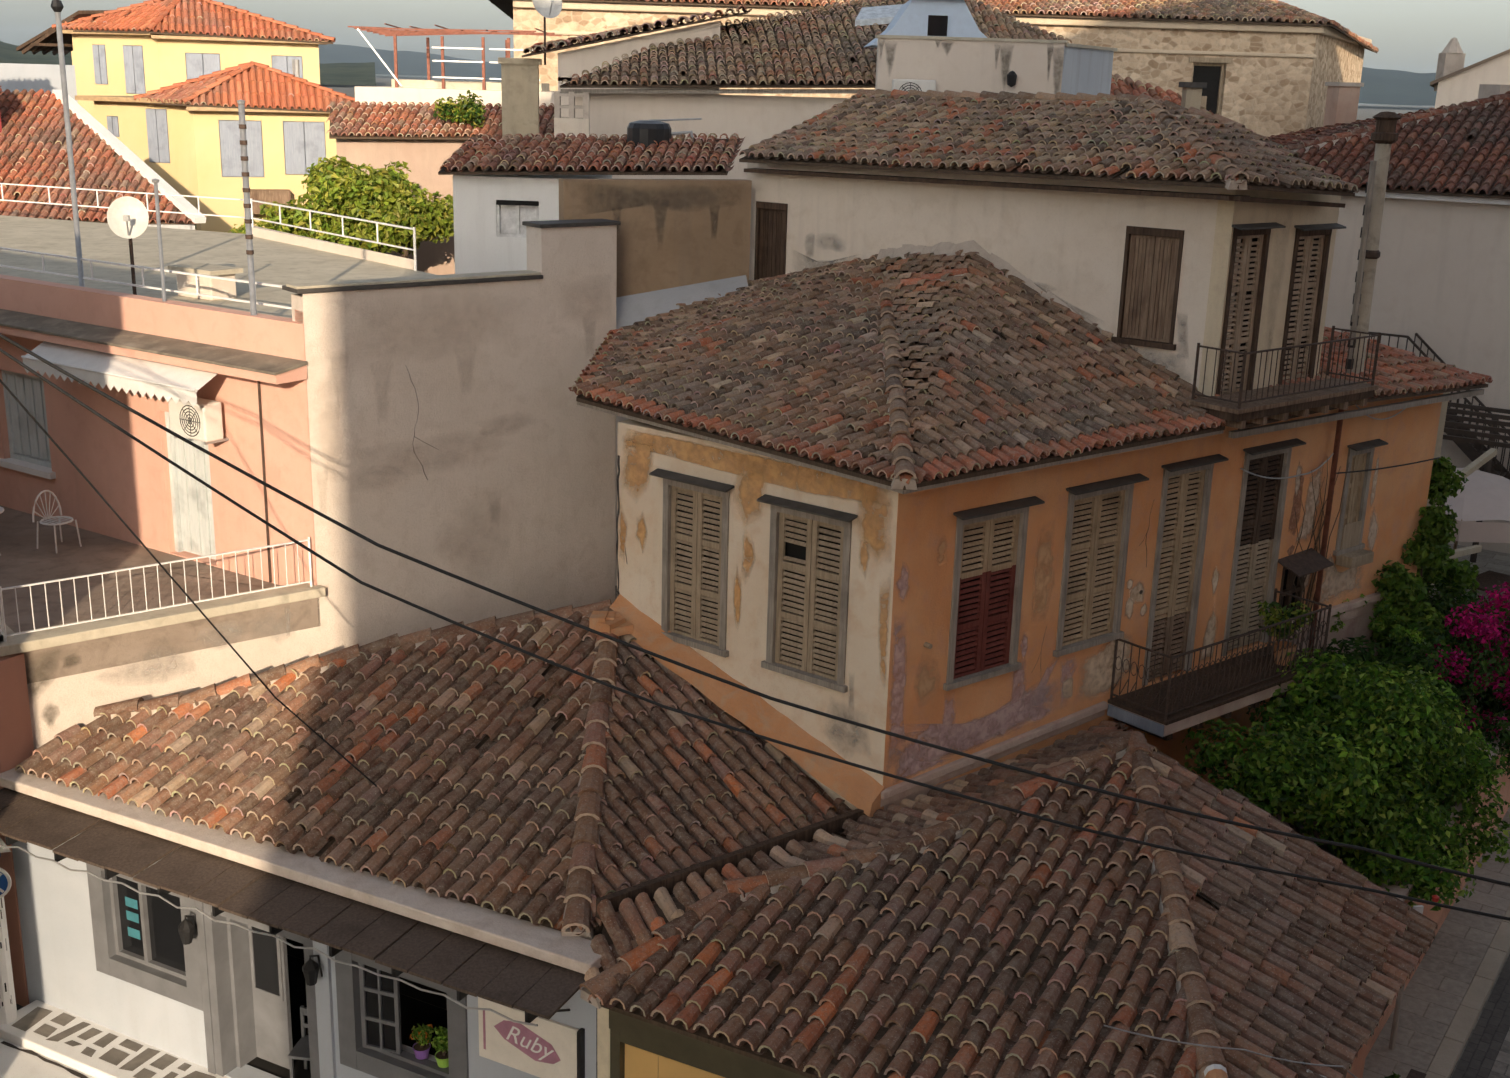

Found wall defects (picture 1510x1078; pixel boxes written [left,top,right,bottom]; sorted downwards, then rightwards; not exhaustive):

crack [405,365,435,480]
peeling [620,514,646,551]
peeling [880,568,1130,776]